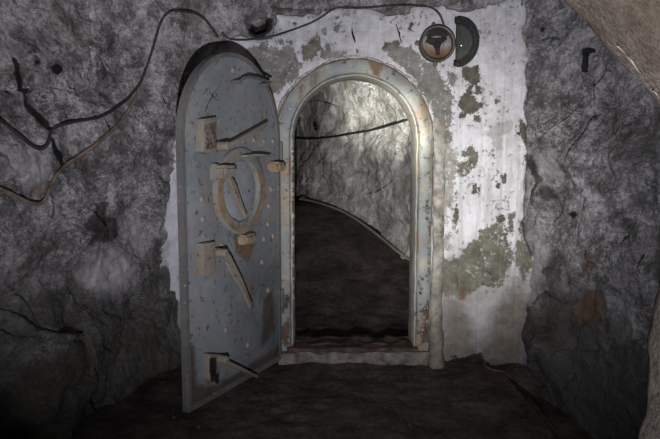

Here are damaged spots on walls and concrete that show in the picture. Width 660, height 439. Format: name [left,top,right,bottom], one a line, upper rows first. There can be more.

peeling [247,16,347,95]
crack [12,57,65,166]
peeling [382,40,495,250]
rust [417,269,430,347]
peeling [443,212,542,313]